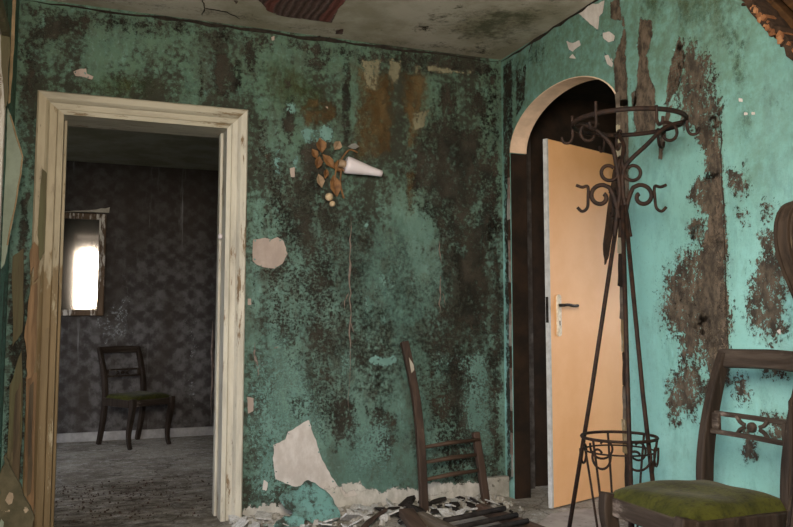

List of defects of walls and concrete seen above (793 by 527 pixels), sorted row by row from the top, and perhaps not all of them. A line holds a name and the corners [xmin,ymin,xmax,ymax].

leakage [20,2,273,99]
flaking render [259,0,346,34]
flaking render [566,39,581,59]
flaking render [252,237,288,269]
leakage [248,39,537,483]
peeling [579,0,793,430]
leakage [3,190,31,478]
flaking render [242,332,480,516]
peeling [457,350,499,461]
peeling [742,430,759,464]